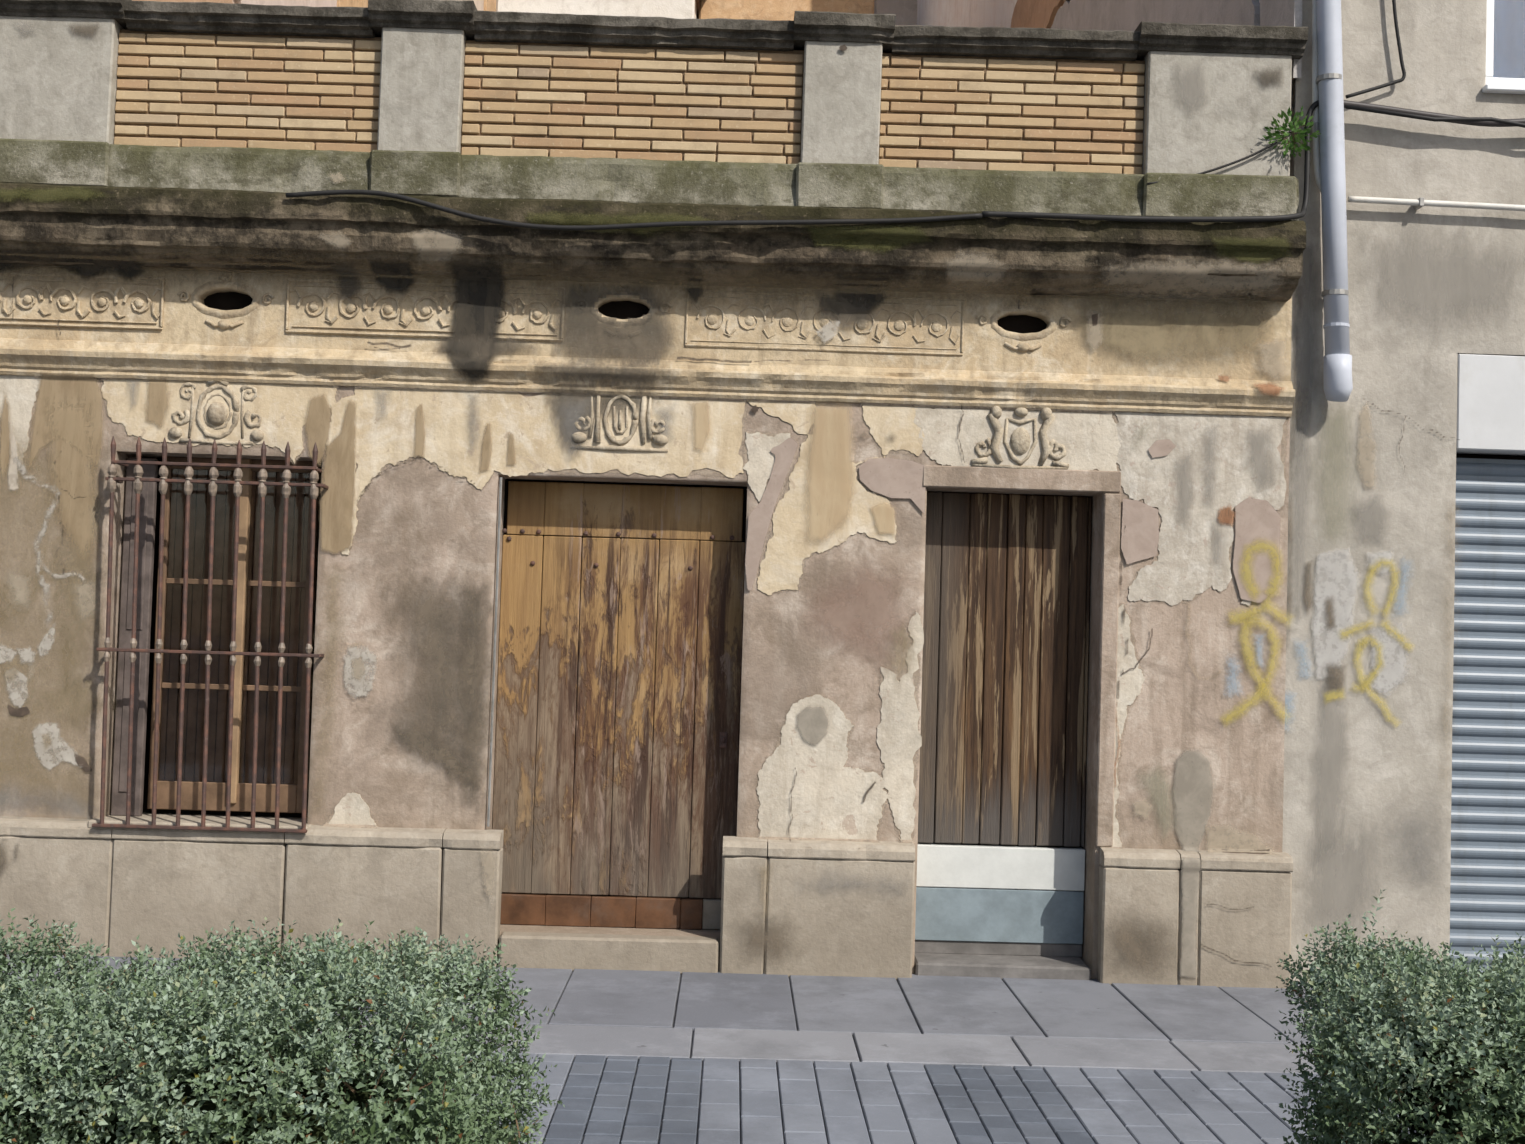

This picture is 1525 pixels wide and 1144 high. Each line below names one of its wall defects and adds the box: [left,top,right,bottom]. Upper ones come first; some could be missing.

damp [441,263,534,382]
peeling [0,375,41,463]
spalling [78,583,96,617]
peeling [101,378,1289,849]
spalling [0,628,92,772]
spalling [1207,825,1274,855]